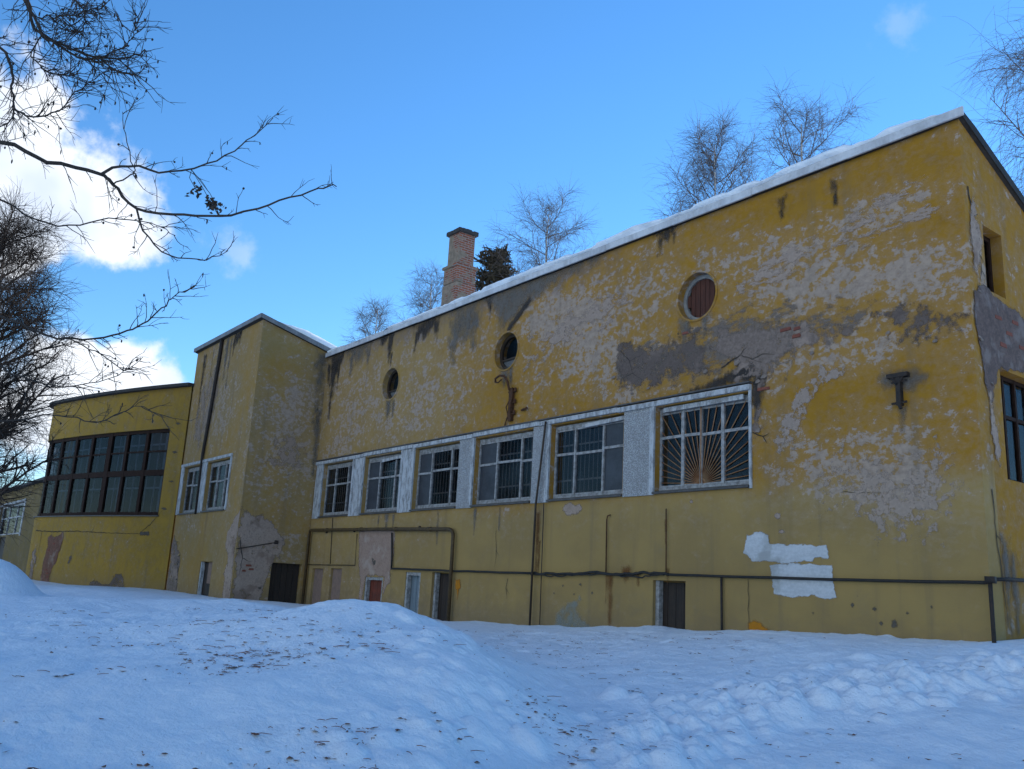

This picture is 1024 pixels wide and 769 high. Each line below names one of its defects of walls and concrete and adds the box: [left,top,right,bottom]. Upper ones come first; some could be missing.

flaking render [611,181,1024,466]